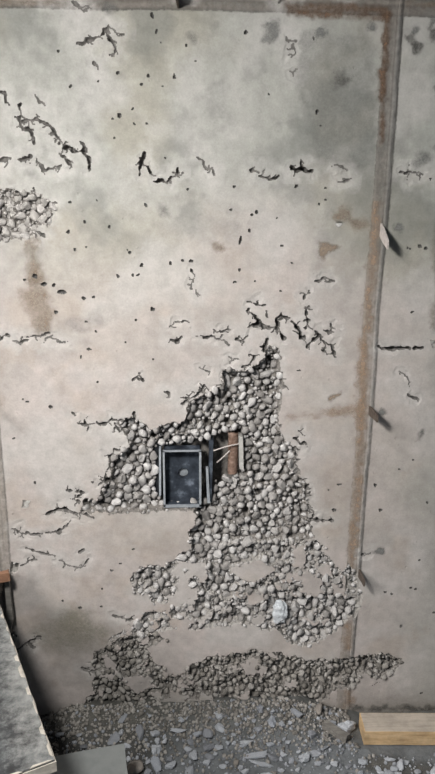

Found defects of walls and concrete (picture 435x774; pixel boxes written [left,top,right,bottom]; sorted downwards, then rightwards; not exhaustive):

crack [76,24,125,70]
rust [286,3,390,138]
flaking render [0,189,57,243]
crack [0,90,92,242]
crack [135,151,184,184]
crack [249,159,352,183]
crack [131,372,145,382]
crack [164,276,337,405]
crack [377,344,424,352]
crack [11,411,137,571]
flaking render [81,346,403,705]
crack [291,428,334,524]